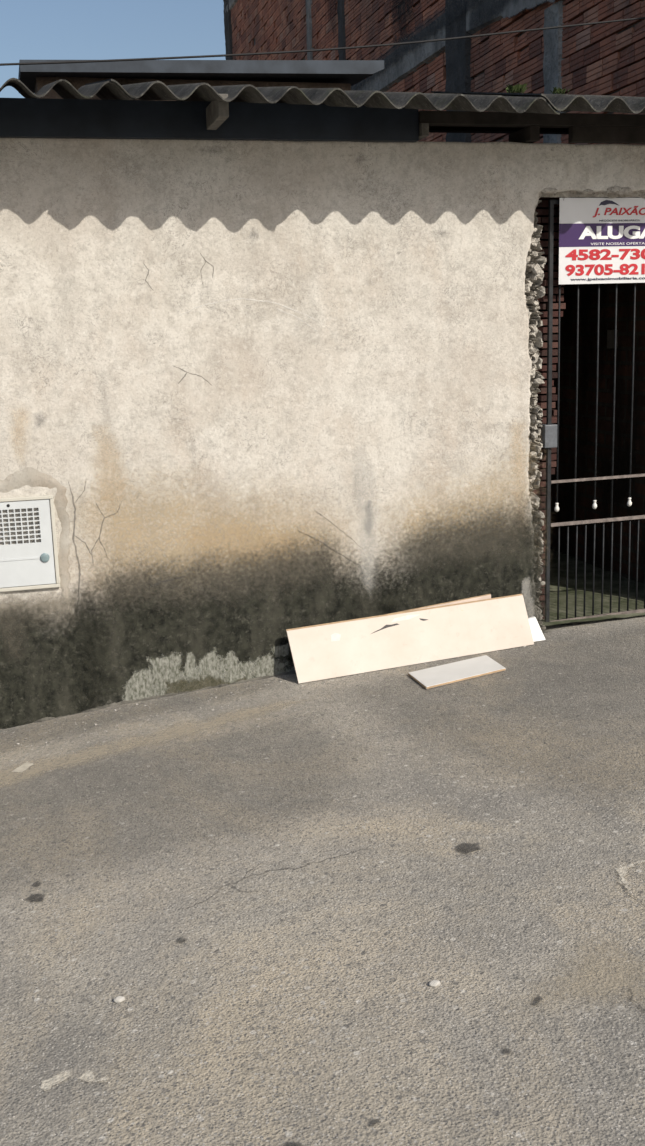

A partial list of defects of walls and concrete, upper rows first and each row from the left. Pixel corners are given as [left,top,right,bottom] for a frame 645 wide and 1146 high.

peeling [122,644,295,701]
leakage [0,482,545,729]